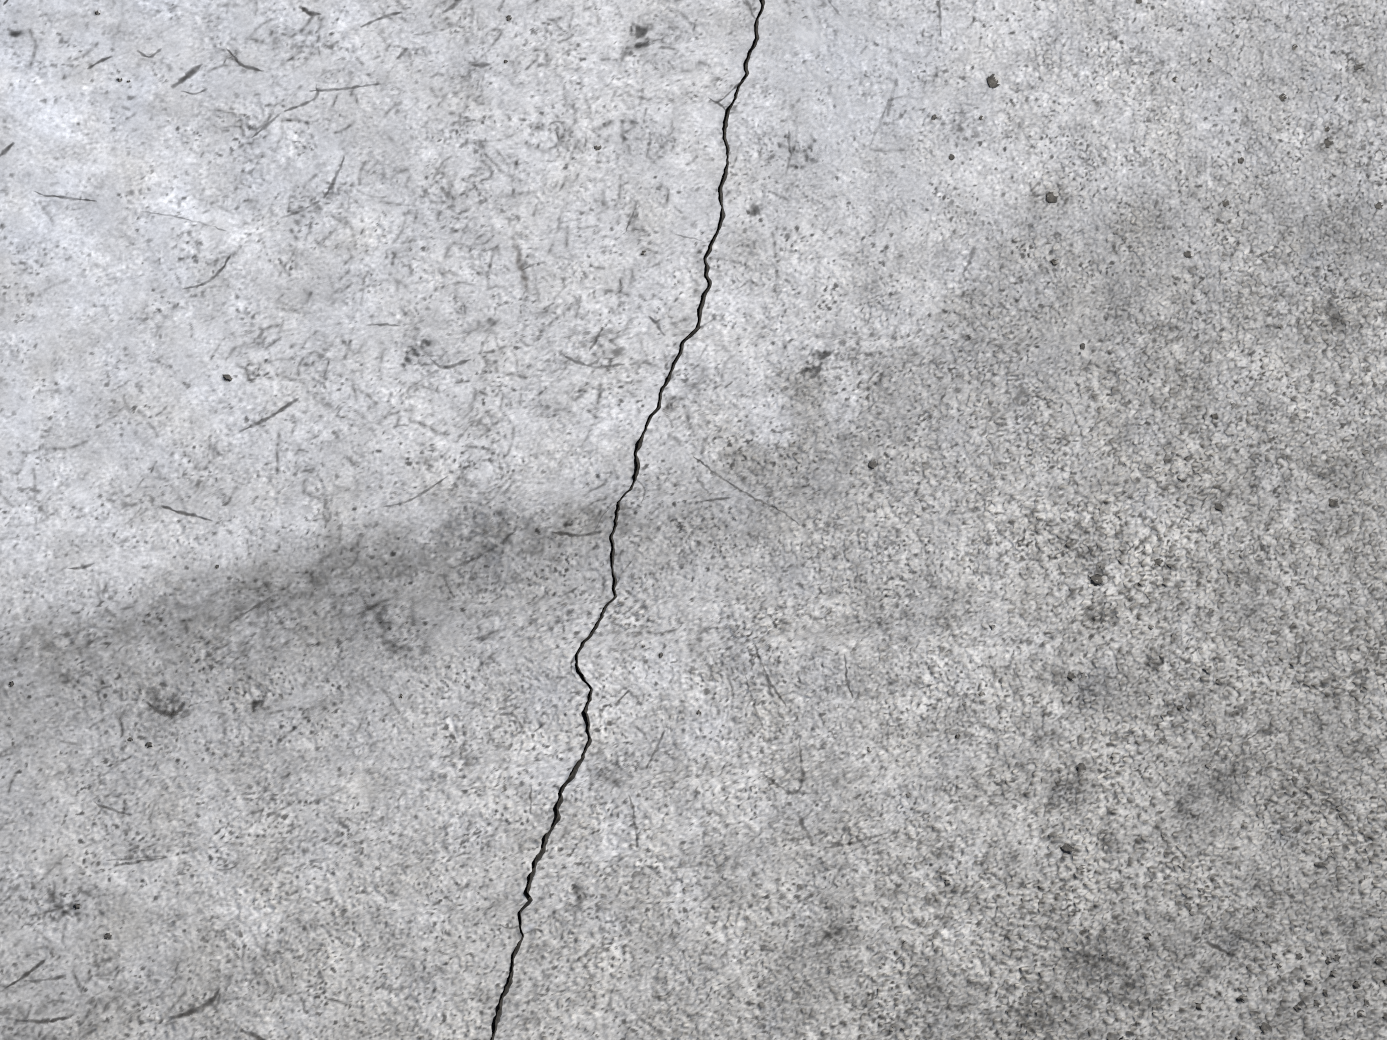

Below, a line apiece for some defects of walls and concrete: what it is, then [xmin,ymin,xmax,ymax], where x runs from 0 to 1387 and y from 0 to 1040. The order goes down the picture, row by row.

crack [490,0,765,1040]